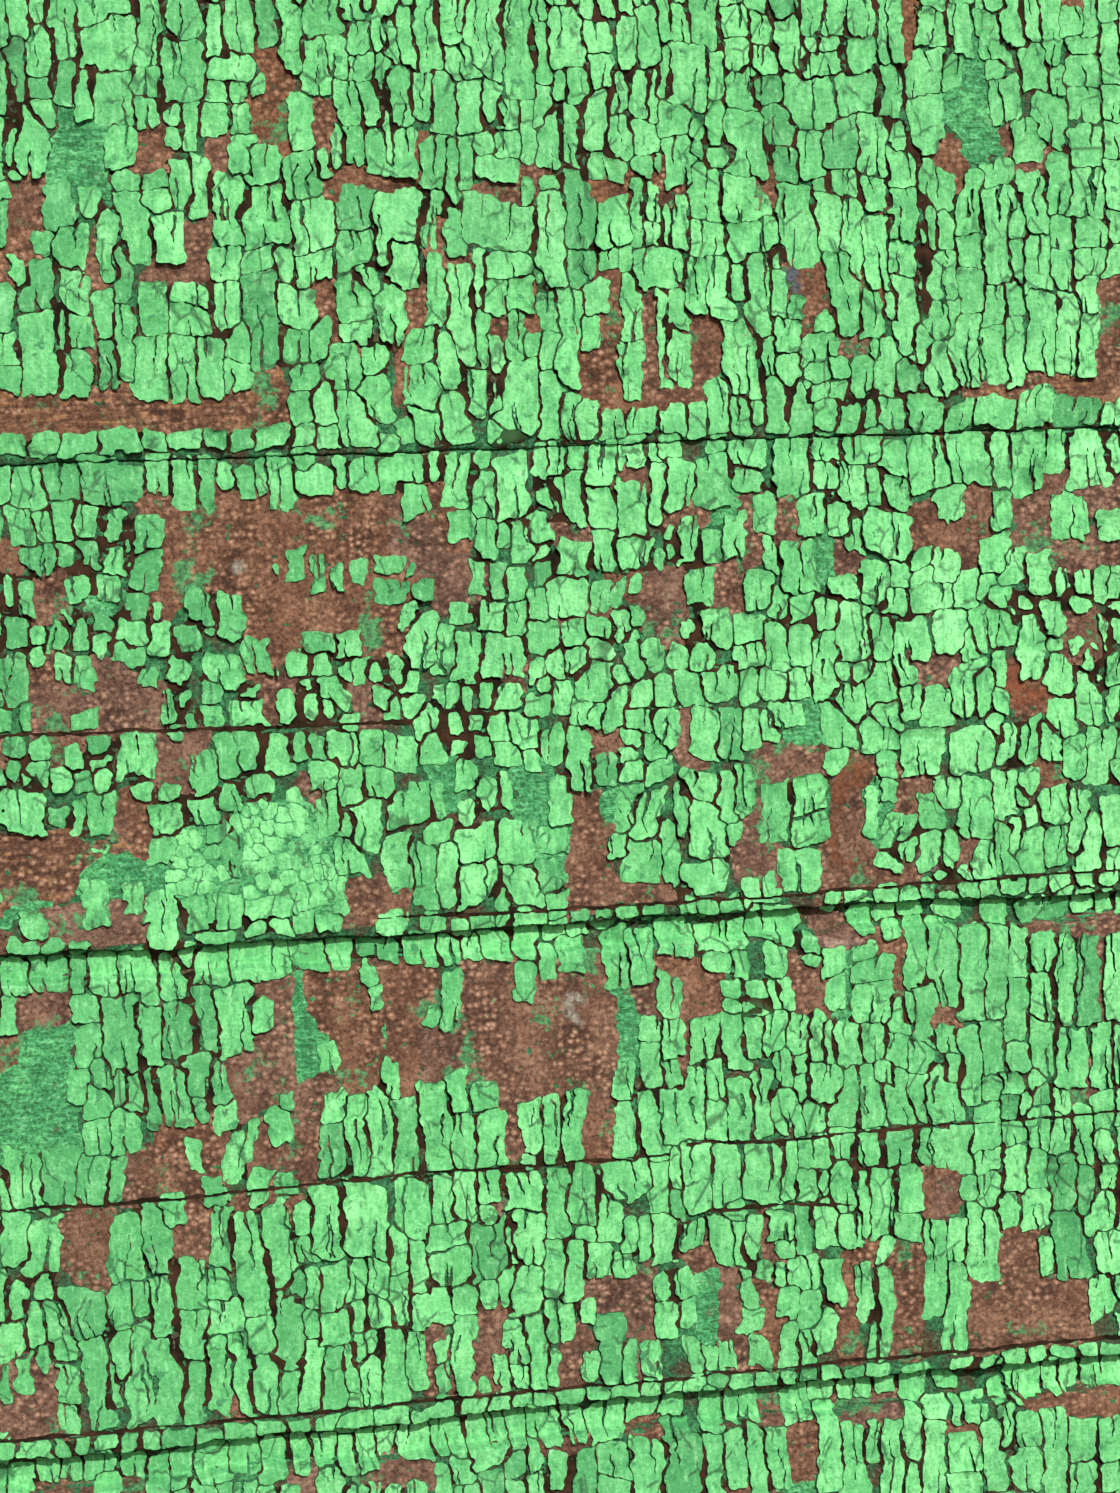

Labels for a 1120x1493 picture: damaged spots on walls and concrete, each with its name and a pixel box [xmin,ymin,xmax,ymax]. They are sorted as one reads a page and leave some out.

crack [1,453,162,596]
crack [0,0,1120,548]
peeling [0,0,1120,955]
crack [410,200,1120,842]
crack [0,564,1120,1493]